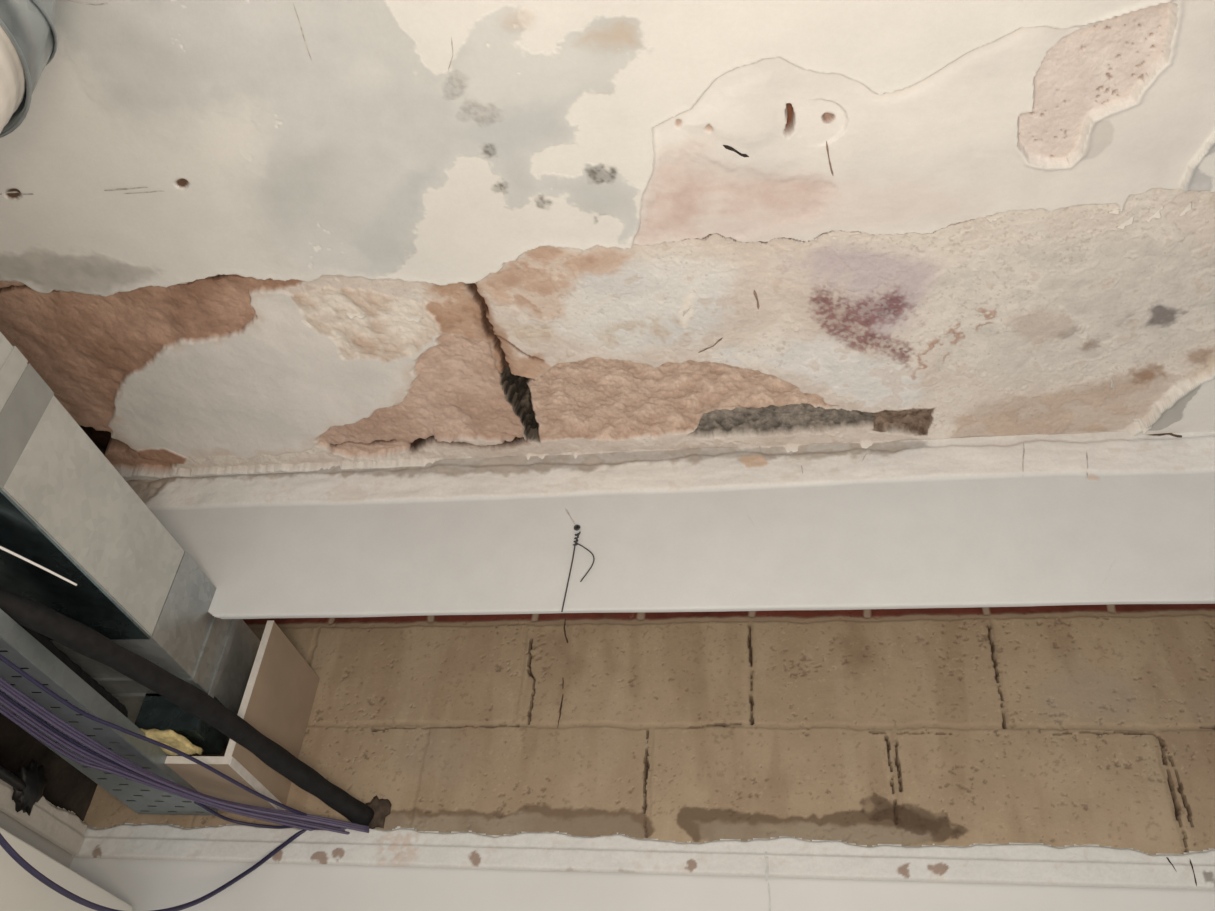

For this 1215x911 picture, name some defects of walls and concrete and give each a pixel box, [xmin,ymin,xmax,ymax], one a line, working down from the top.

leakage [55,0,655,282]
flaking render [0,0,1215,477]
leakage [770,236,954,370]
crack [329,283,545,454]
crack [373,725,405,733]
crack [453,638,564,728]
crack [642,730,650,814]
crack [689,625,754,728]
leakage [676,791,970,847]
crack [869,731,952,805]
crack [986,623,1007,729]
crack [1053,731,1197,886]